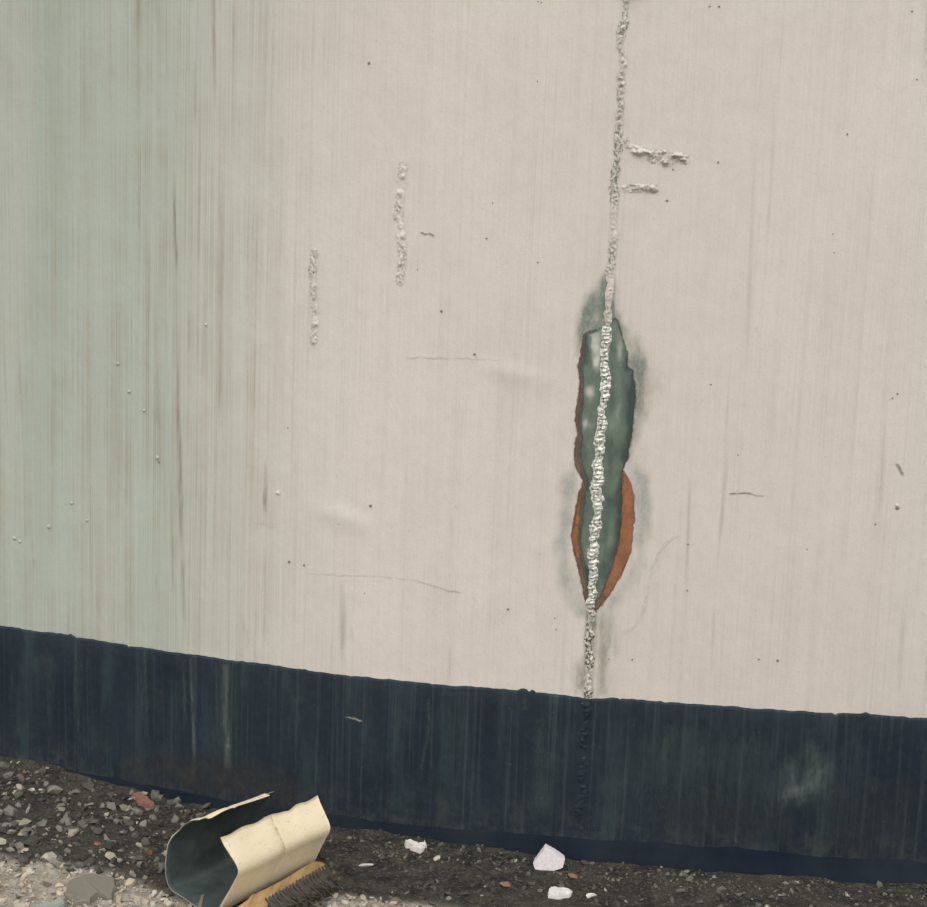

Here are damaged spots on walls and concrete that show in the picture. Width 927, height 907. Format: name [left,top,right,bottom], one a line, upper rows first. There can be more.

water stain [579,277,614,343]
water stain [630,355,645,410]
peeling [571,318,636,611]